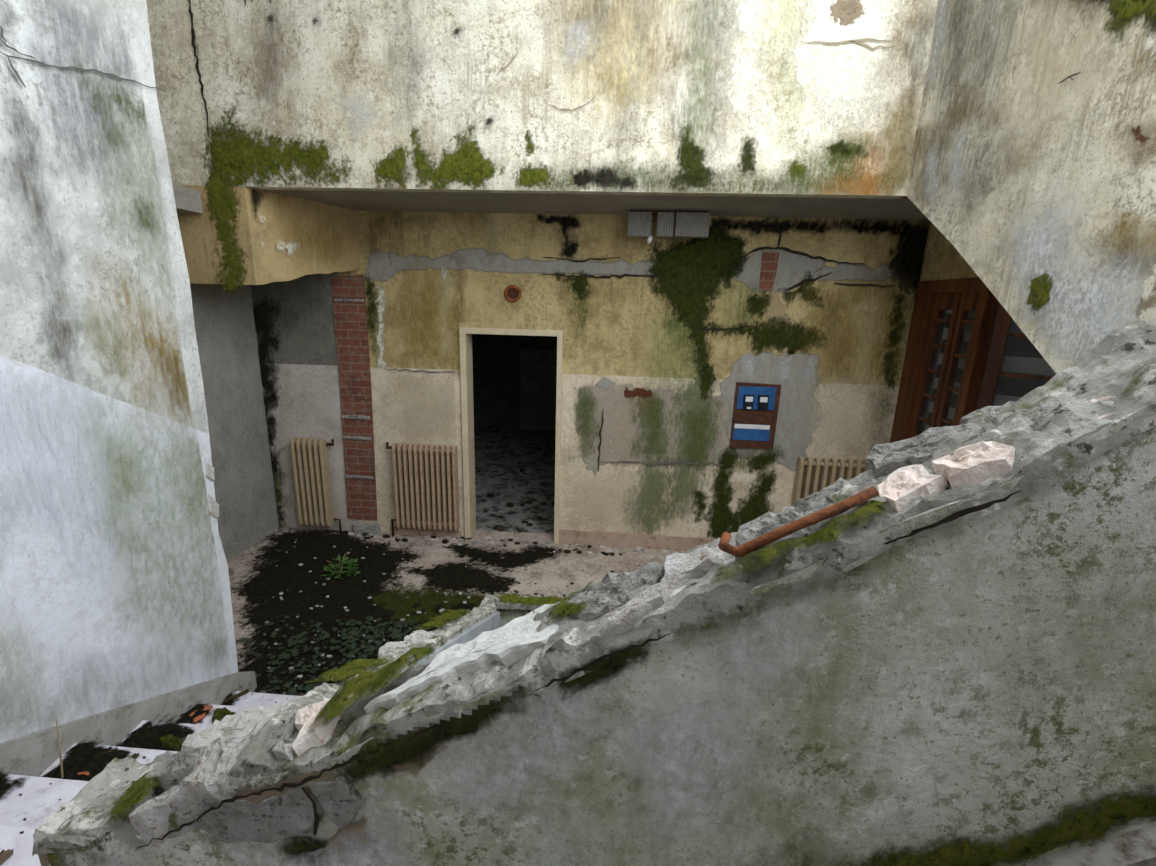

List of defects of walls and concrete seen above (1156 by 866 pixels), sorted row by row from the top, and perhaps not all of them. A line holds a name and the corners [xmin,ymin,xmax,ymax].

crack [0,38,165,92]
crack [188,0,209,136]
peeling [277,226,334,259]
flaking render [759,252,779,291]
spalling [168,264,1156,866]
corrosion [718,486,879,558]
spalling [32,756,165,856]
leakage [448,685,596,806]
leakage [628,707,744,833]